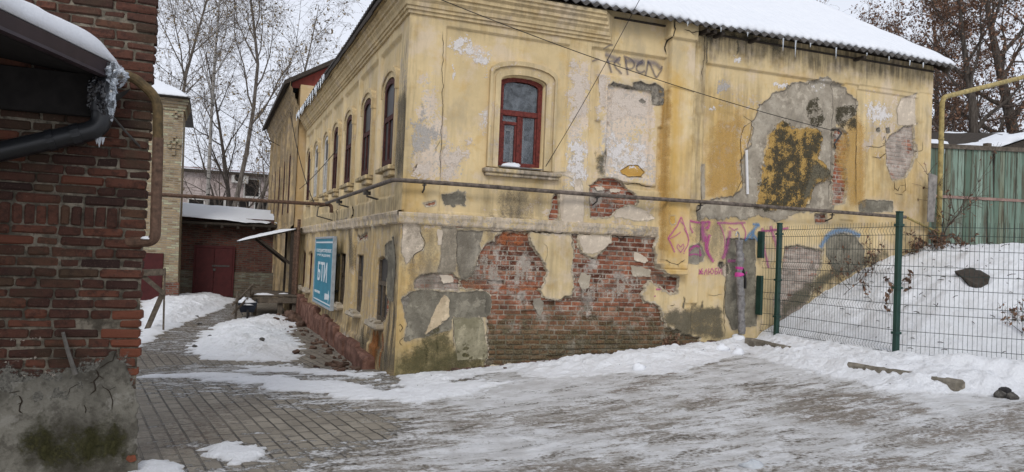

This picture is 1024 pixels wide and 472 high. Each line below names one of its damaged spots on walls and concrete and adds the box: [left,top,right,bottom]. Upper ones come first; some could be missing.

crack [436,32,444,172]
peeling [447,34,491,78]
spalling [383,61,701,366]
leakage [754,98,863,212]
flaking render [696,76,923,224]
crack [68,353,115,413]